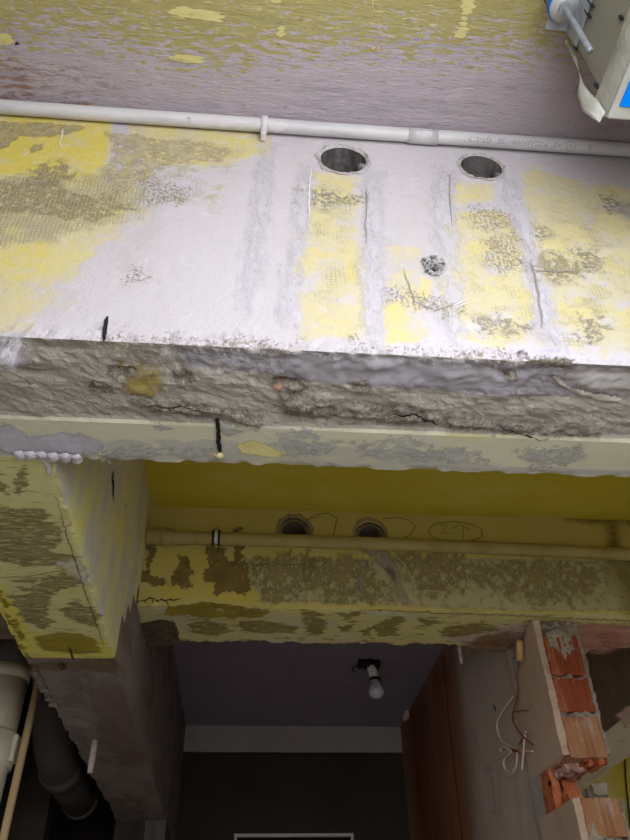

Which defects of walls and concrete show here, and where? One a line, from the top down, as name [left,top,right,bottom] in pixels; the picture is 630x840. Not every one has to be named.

peeling [473,316,533,335]
spalling [0,326,336,375]
spalling [346,345,578,381]
crack [139,404,222,453]
crack [389,413,439,425]
spalling [267,373,600,441]
crack [499,425,540,441]
peeling [0,505,82,659]
peeling [60,602,103,627]
crack [137,596,179,604]
peeling [141,545,406,647]
peeling [396,552,607,606]